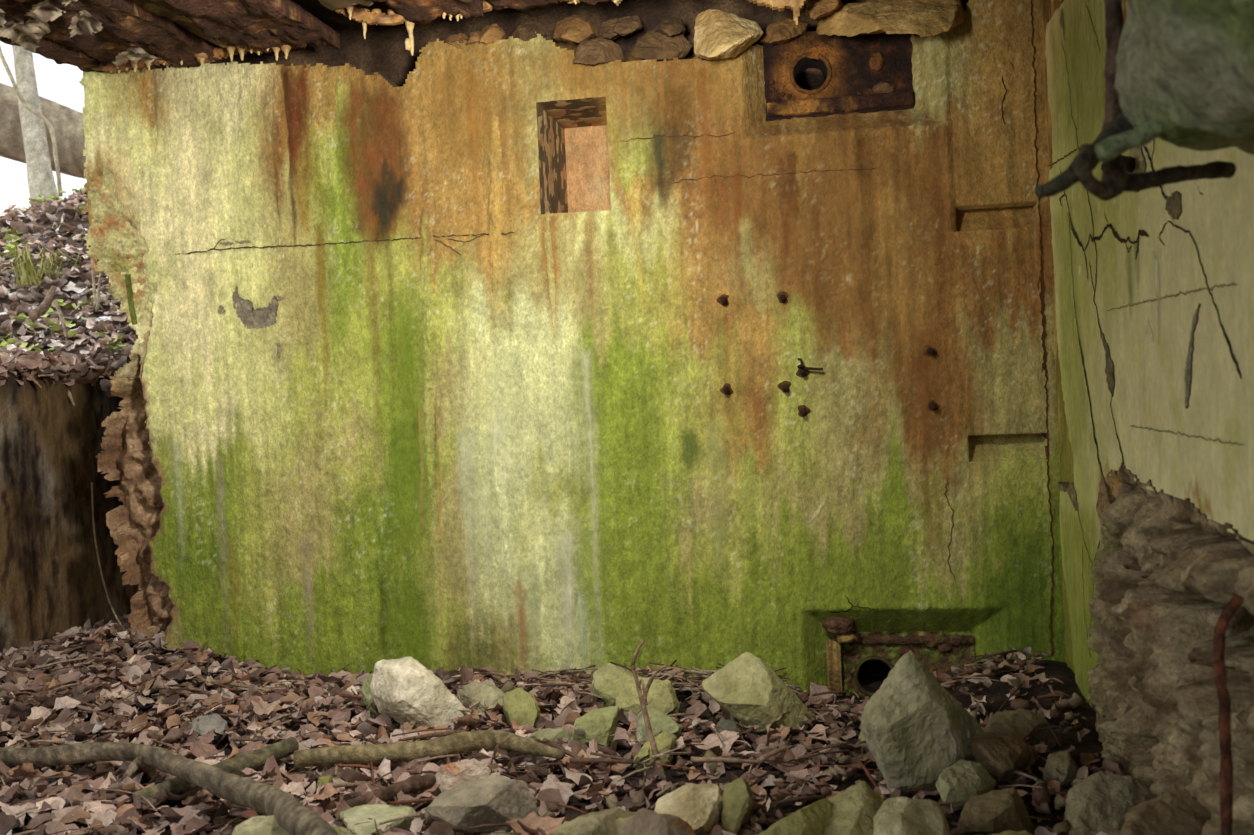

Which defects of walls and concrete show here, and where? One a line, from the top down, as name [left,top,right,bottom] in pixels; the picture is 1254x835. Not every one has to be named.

rust [807,46,829,60]
rust [869,52,894,94]
rust [343,88,404,242]
spalling [81,168,173,638]
peeling [218,287,286,329]
damp [317,232,326,333]
crack [175,232,515,256]
rust [777,365,810,393]
crack [1001,0,1243,657]
spalling [1184,304,1201,408]
spalling [1086,462,1254,830]